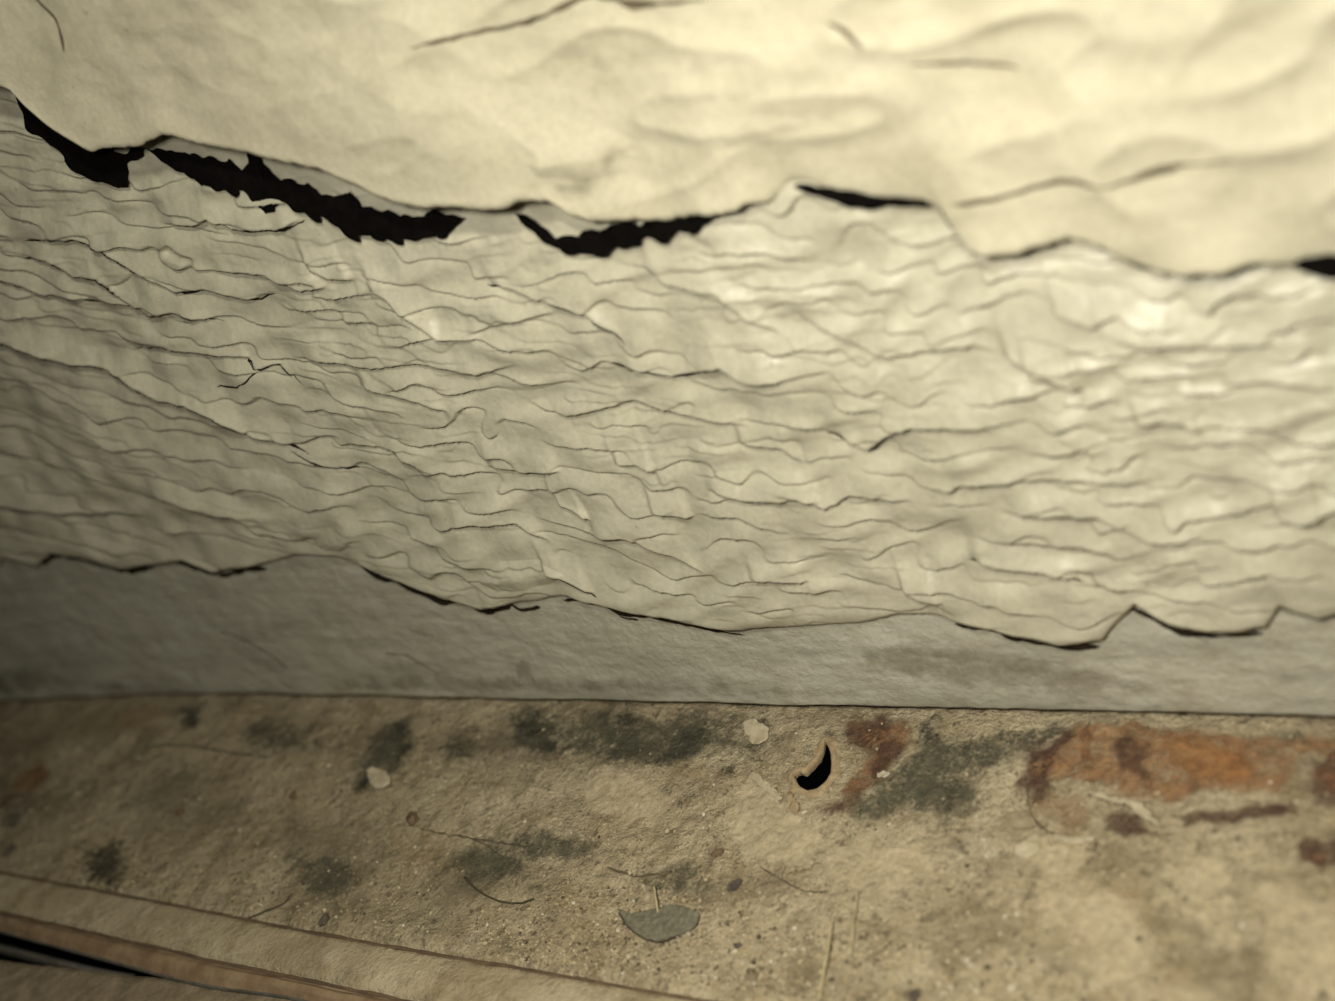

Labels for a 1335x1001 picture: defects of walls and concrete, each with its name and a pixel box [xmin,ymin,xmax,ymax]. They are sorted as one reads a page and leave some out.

crack [15,96,466,245]
crack [792,160,1233,230]
crack [513,212,727,258]
crack [1286,254,1335,279]
peeling [0,0,1335,646]
crack [361,566,742,635]
leakage [347,722,412,792]
leakage [512,705,755,765]
corrosion [826,717,910,812]
leakage [858,716,1058,819]
corrosion [1014,722,1335,827]
corrosion [1107,812,1146,836]